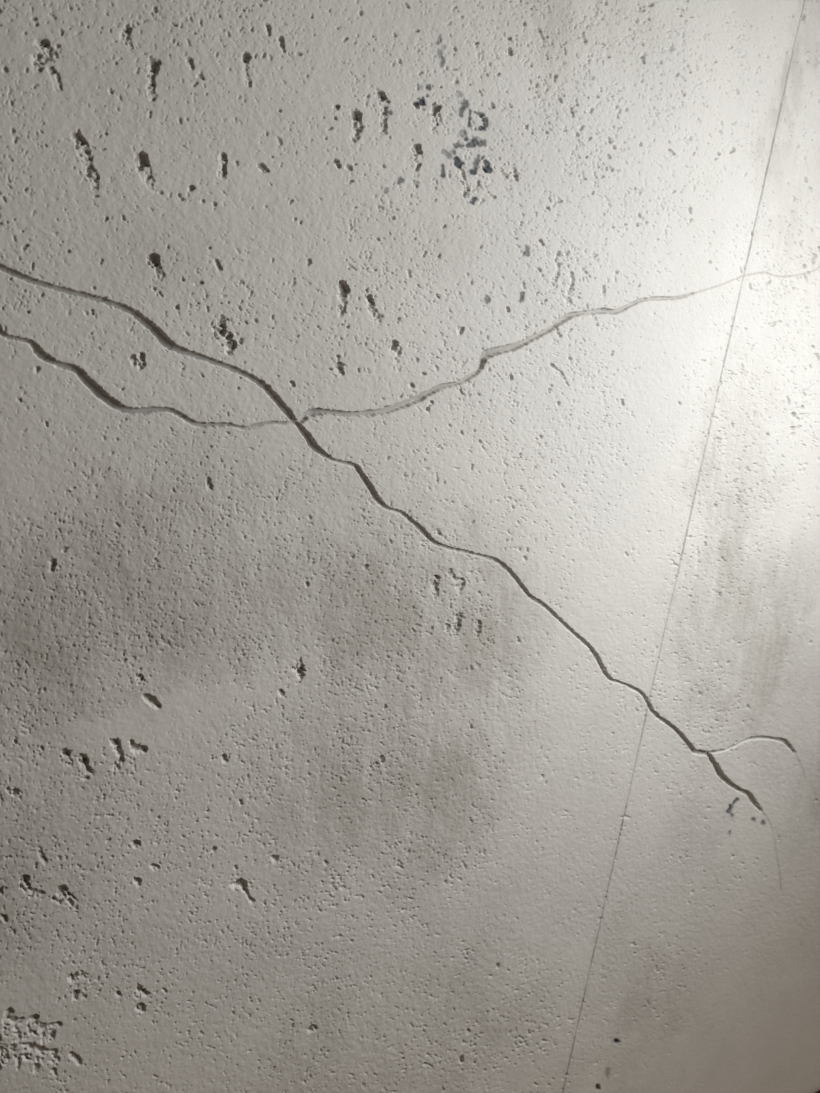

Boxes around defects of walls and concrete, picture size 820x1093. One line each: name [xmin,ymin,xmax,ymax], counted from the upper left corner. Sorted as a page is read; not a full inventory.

crack [0,263,820,890]